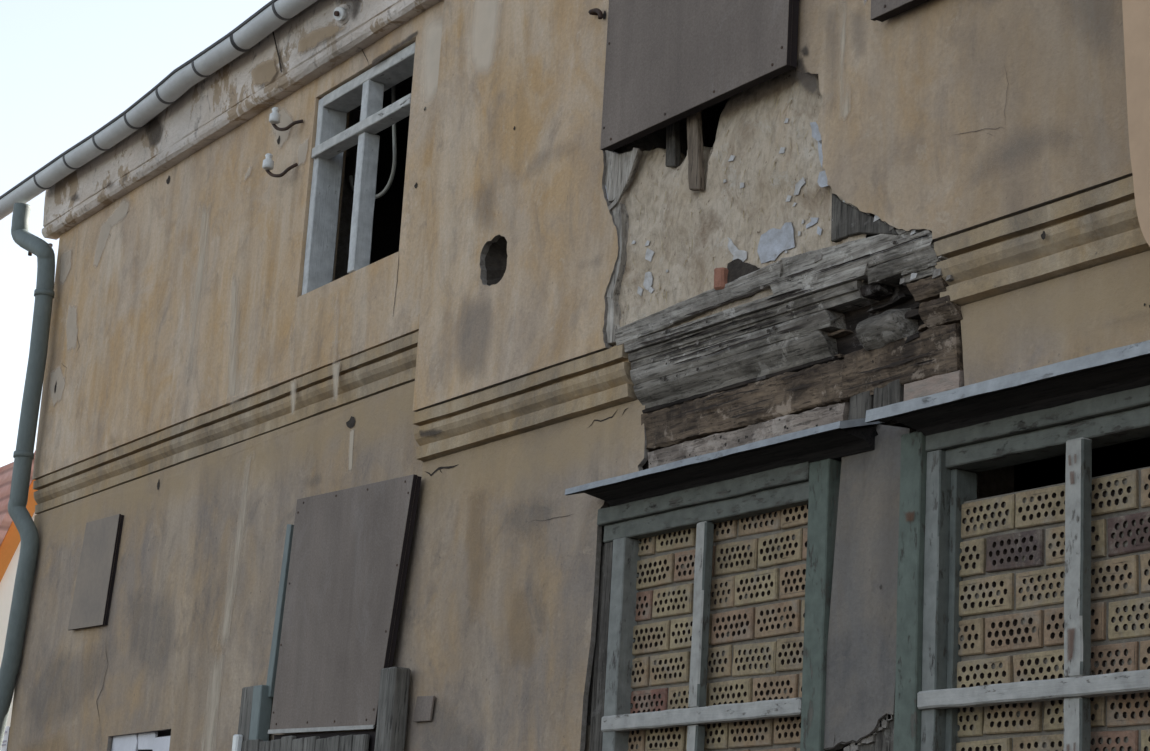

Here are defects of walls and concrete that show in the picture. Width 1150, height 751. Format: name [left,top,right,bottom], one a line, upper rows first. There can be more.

flaking render [605,68,867,347]
flaking render [836,714,894,751]